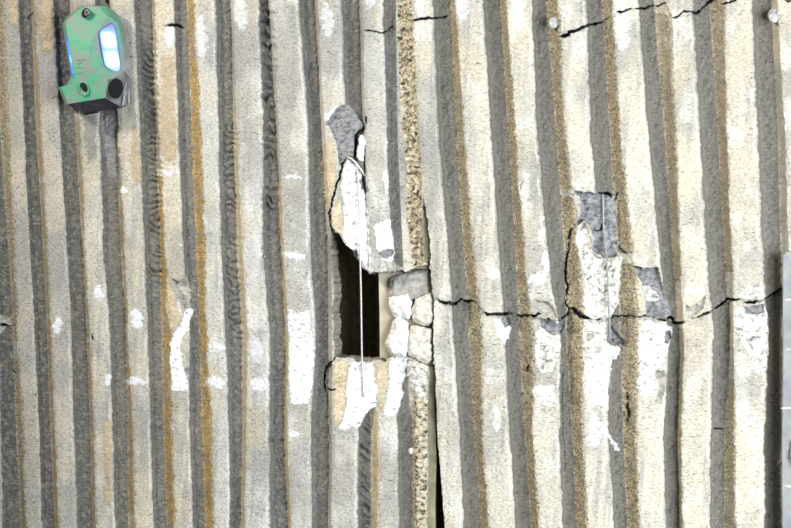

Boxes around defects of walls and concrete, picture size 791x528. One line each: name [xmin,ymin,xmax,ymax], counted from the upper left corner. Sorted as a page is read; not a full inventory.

crack [365,15,447,34]
crack [559,0,736,38]
spalling [323,104,405,272]
spalling [574,191,626,407]
crack [437,228,781,334]
spalling [635,266,673,402]
spalling [338,357,428,430]